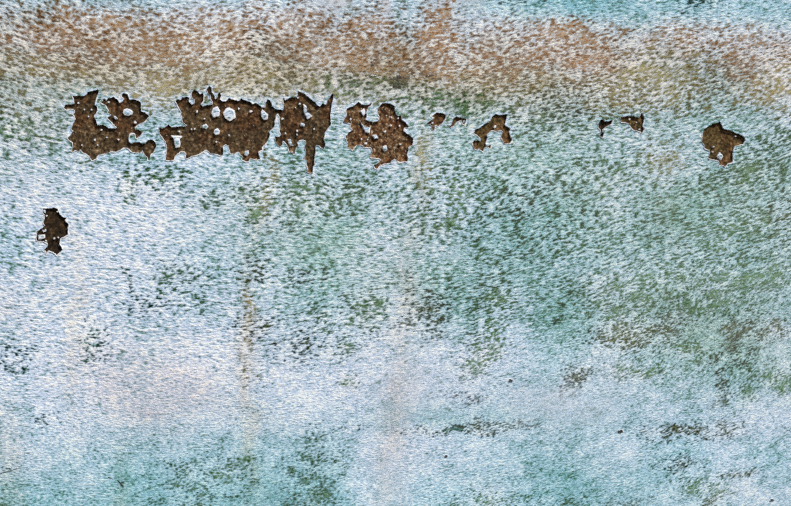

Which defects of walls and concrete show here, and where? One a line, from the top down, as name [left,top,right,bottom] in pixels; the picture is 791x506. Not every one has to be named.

corrosion [0,0,791,124]
peeling [63,86,334,173]
peeling [343,101,414,170]
peeling [426,112,513,153]
peeling [597,113,645,139]
peeling [701,121,746,168]
peeling [36,207,70,257]